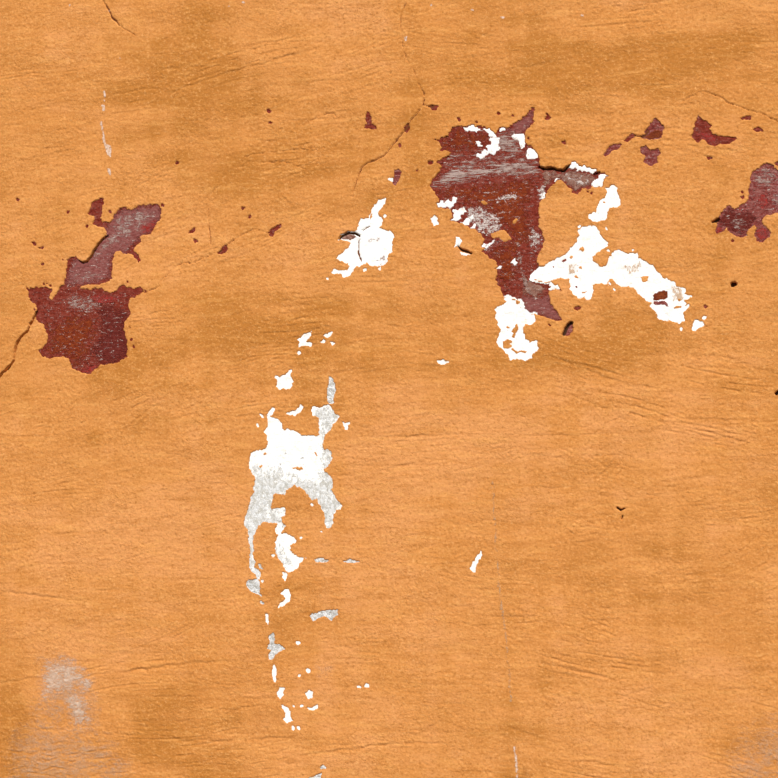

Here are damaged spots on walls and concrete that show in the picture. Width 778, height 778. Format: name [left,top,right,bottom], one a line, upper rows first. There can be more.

crack [355,92,439,187]
peeling [692,116,737,146]
peeling [27,198,164,374]
peeling [326,198,394,280]
peeling [430,108,707,361]
peeling [715,163,778,242]
peeling [275,369,294,390]
peeling [244,376,350,608]
peeling [267,633,318,731]